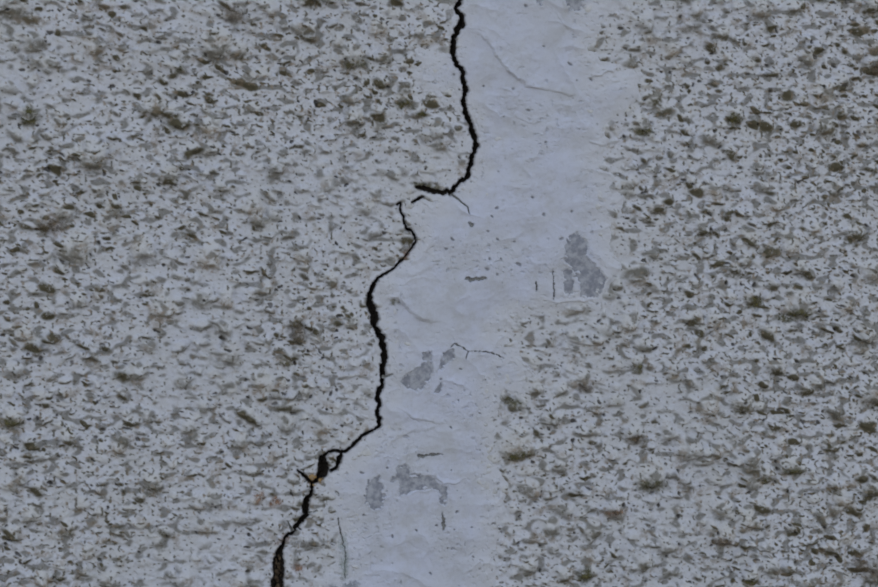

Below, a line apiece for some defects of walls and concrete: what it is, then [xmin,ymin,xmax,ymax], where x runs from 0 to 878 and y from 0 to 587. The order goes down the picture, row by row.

crack [271,0,479,587]
spalling [563,232,607,298]
spalling [401,349,455,393]
crack [451,343,503,358]